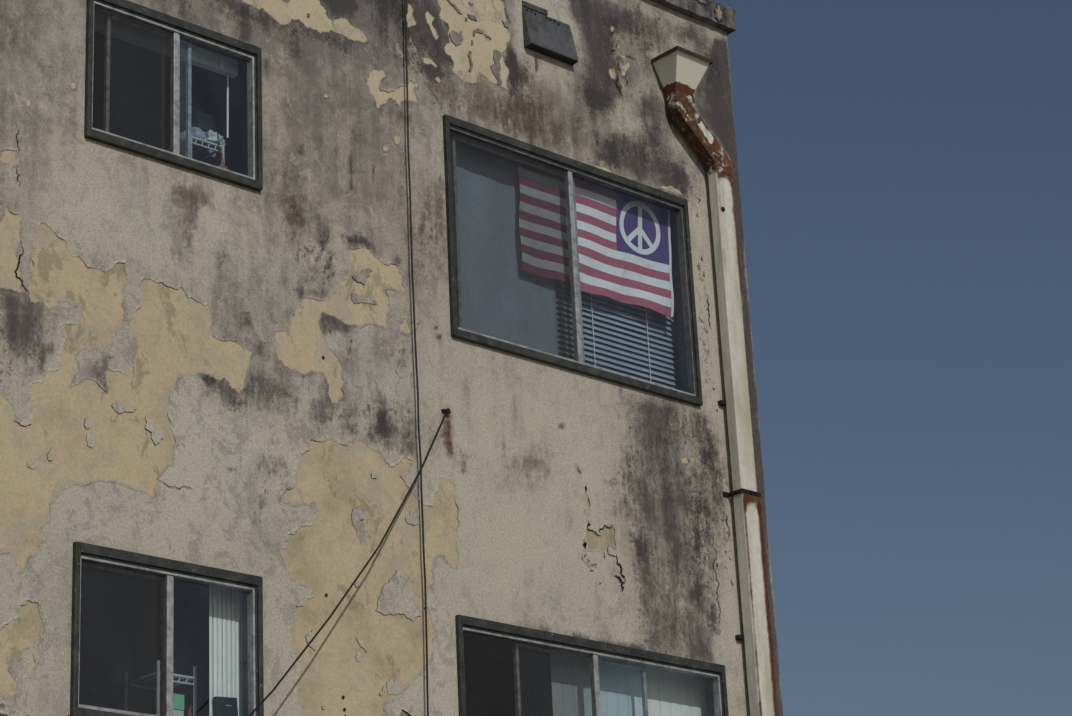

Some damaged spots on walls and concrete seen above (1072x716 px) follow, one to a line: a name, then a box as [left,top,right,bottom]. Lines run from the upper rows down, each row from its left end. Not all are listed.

peeling [238,0,370,46]
peeling [365,67,421,113]
peeling [403,0,512,91]
water stain [567,0,660,117]
water stain [595,91,693,198]
peeling [272,246,420,405]
peeling [0,205,255,575]
peeling [0,597,46,716]
peeling [279,435,460,716]
crack [580,472,626,591]
water stain [607,402,722,661]
corrosion [743,493,778,716]